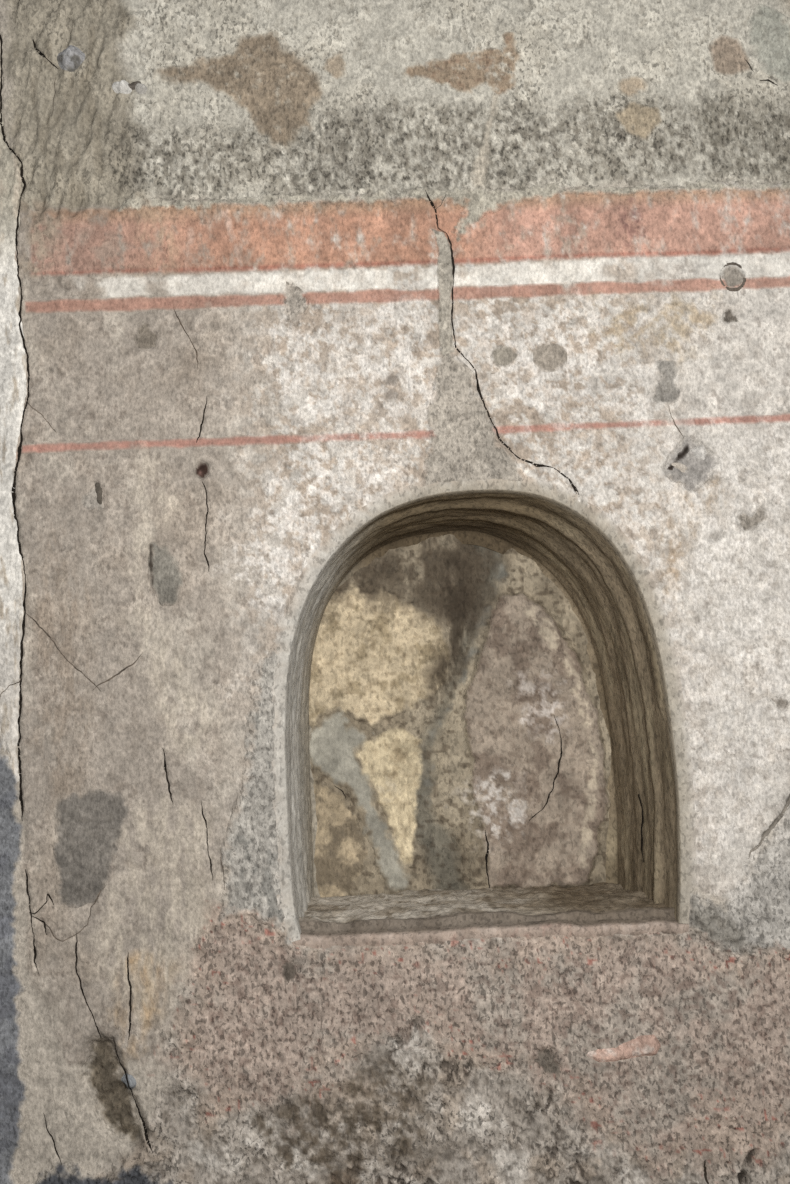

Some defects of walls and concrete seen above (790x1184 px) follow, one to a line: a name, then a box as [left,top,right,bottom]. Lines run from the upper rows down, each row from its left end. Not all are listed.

leakage [95,28,790,225]
crack [0,34,141,821]
crack [425,190,579,495]
flaking render [663,437,717,491]
leakage [116,437,227,768]
leakage [73,788,224,1047]
crack [748,795,790,859]